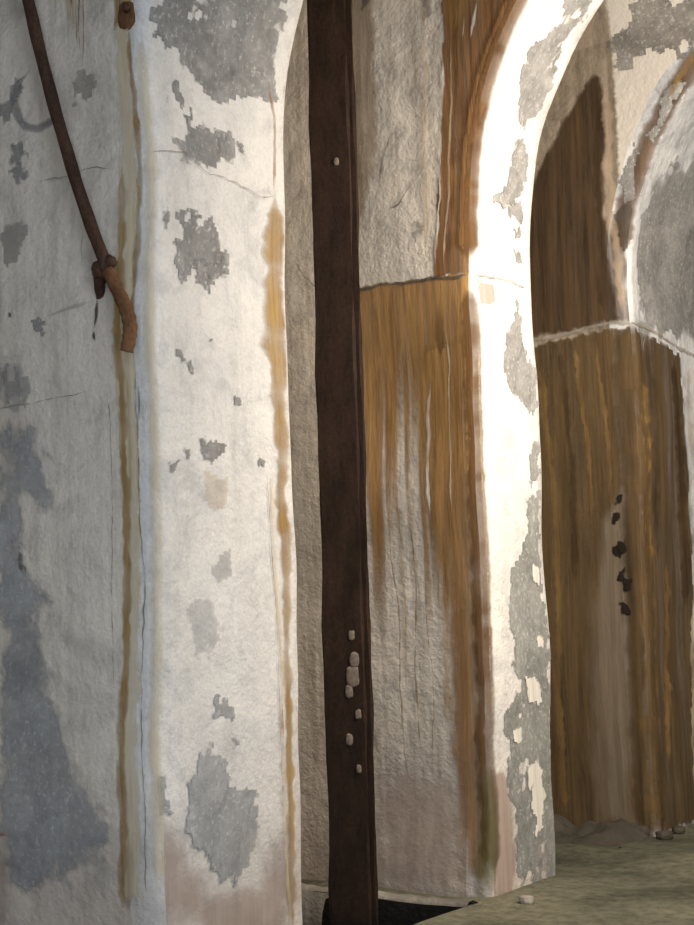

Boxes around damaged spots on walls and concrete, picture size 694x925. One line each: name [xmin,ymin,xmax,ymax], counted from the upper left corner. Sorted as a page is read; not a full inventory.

rust [114,0,140,307]
rust [113,303,141,644]
peeling [149,0,288,104]
rust [360,0,526,878]
peeling [478,280,496,304]
peeling [503,299,539,415]
rust [530,51,694,837]
peeling [607,0,694,70]
peeling [614,142,694,349]
peeling [645,81,687,143]
rust [119,661,136,894]
peeling [503,441,556,887]